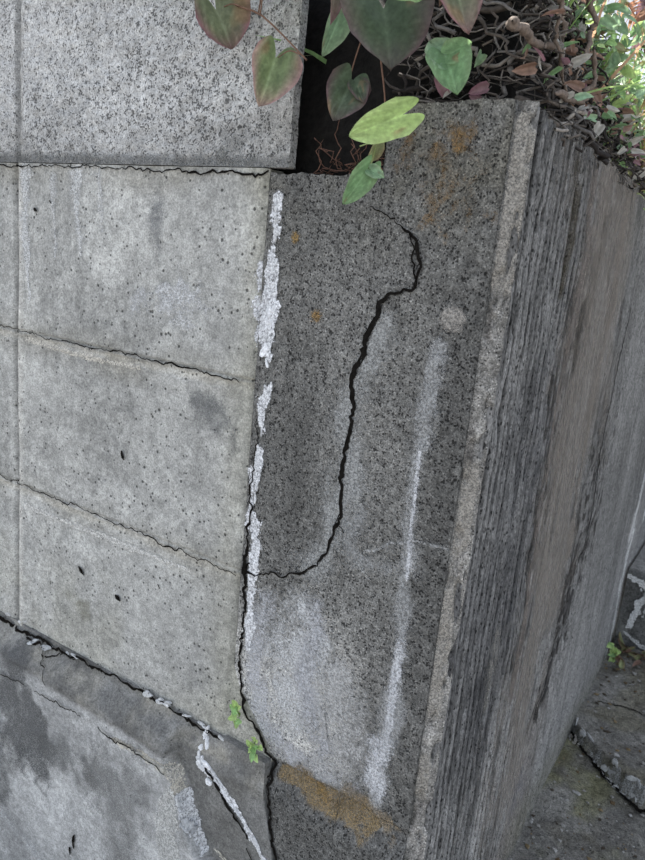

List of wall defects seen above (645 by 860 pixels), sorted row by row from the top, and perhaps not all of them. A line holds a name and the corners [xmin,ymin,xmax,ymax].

crack [0,206,422,860]
corrosion [279,765,399,845]
damp [247,314,445,807]
damp [510,161,628,702]
spalling [569,718,645,806]